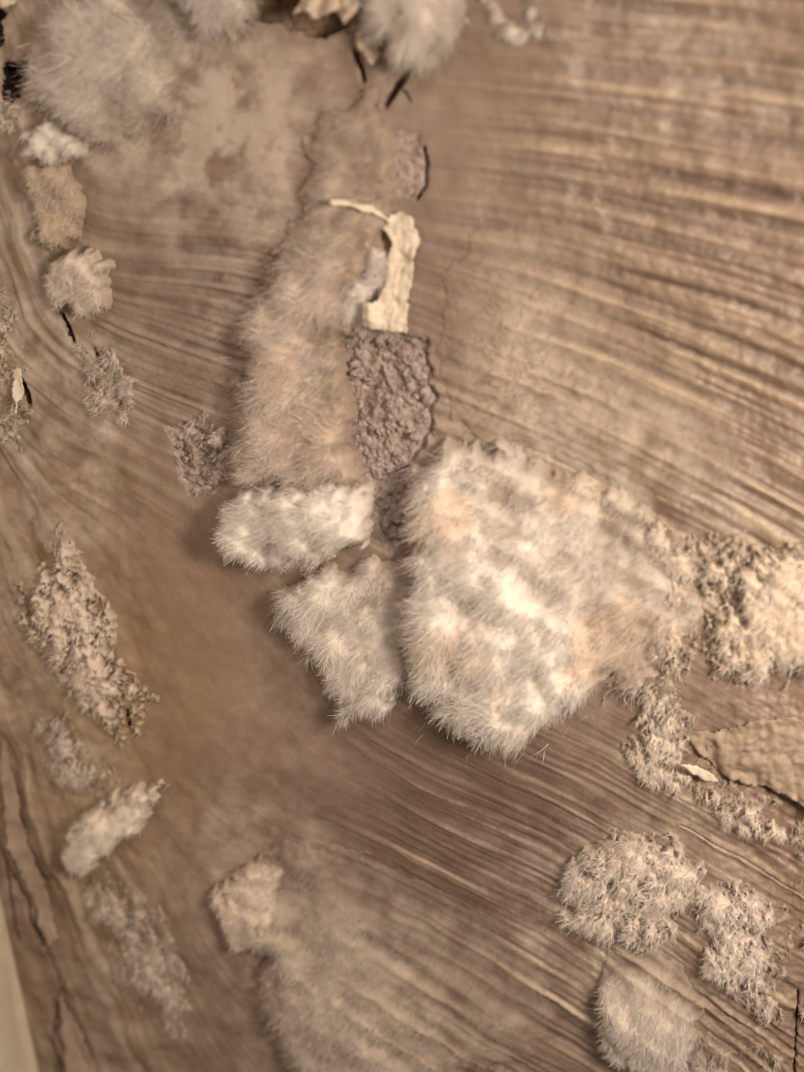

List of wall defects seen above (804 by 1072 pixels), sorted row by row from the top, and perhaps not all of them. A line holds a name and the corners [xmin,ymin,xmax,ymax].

flaking render [244,0,380,65]
damp [0,0,264,454]
flaking render [344,329,439,562]
damp [176,0,804,860]
damp [6,520,191,1045]
peeling [680,717,804,807]
damp [200,829,561,1072]
damp [548,828,804,1072]
crack [792,989,800,1072]